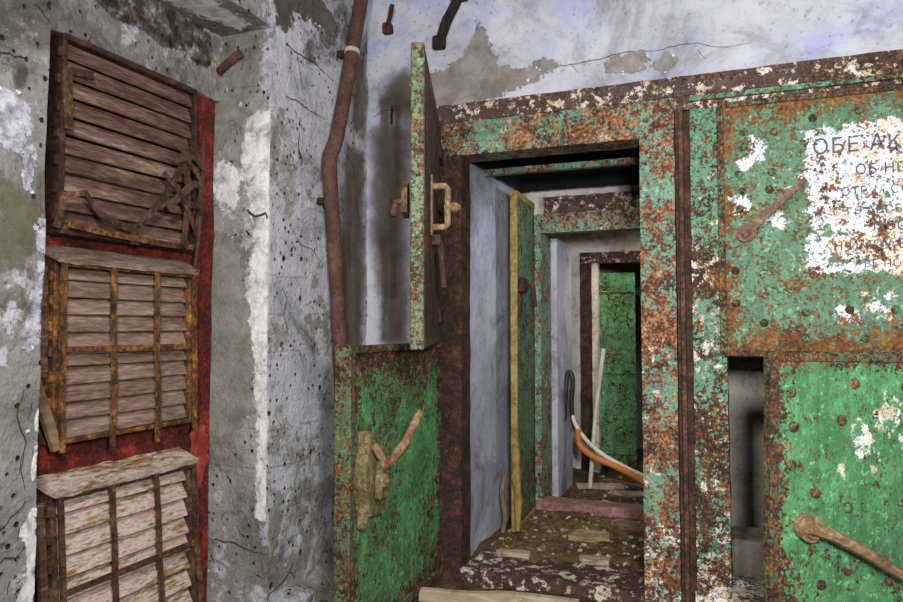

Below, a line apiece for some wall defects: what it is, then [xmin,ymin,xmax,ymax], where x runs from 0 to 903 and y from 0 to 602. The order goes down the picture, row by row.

peeling [430,19,562,106]